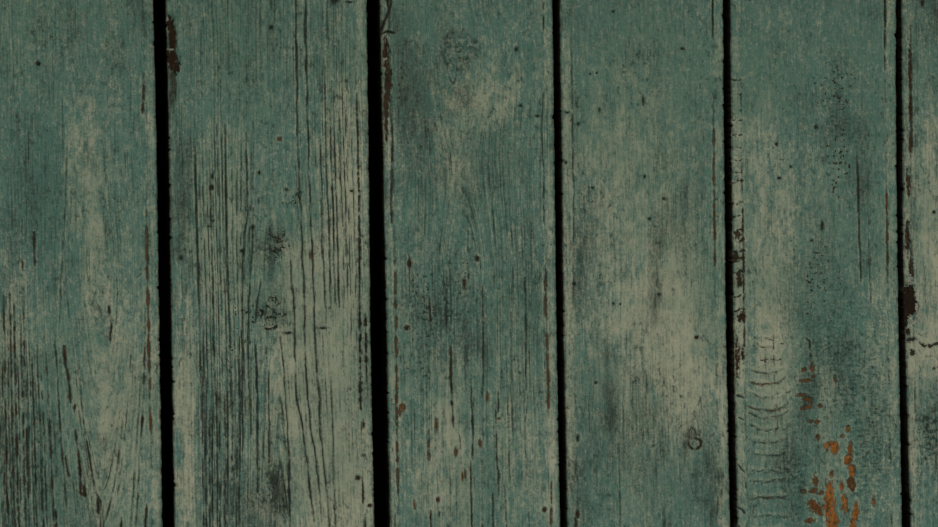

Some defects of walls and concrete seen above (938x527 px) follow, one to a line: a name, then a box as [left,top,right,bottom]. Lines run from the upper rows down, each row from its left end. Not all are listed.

crack [713,79,791,518]
peeling [784,419,860,527]